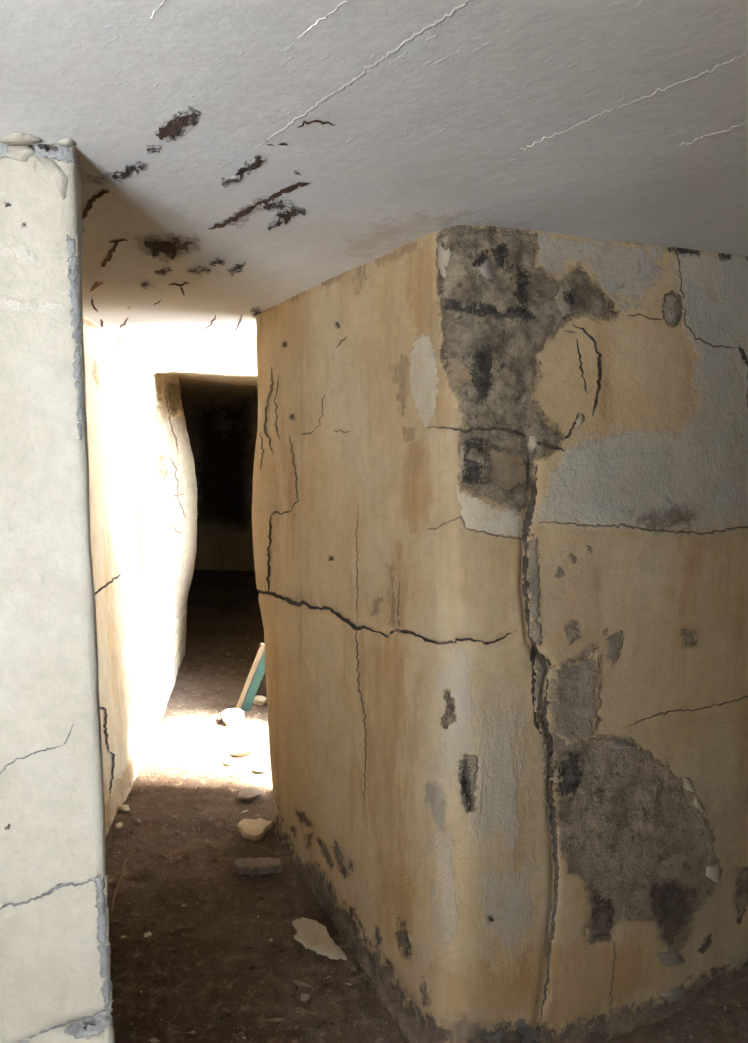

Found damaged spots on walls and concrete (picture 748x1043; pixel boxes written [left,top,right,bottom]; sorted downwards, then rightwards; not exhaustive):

crack [628,250,748,406]
flaking render [553,545,593,580]
crack [258,323,602,1021]
crack [623,696,748,728]
crack [0,723,74,774]
flaking render [546,619,748,967]
crack [0,879,93,910]
water stain [272,790,748,1043]
crack [13,1007,113,1043]